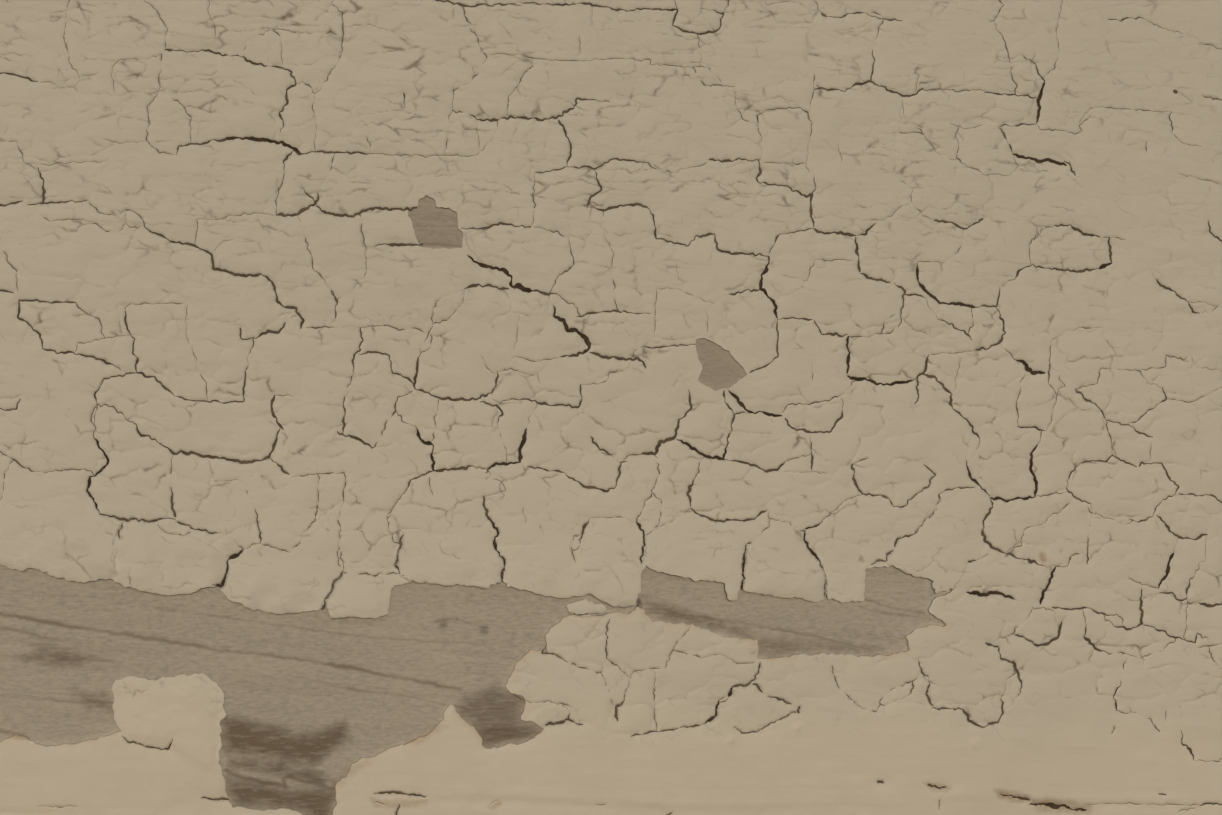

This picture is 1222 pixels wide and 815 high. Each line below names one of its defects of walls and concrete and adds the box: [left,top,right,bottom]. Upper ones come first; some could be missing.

peeling [408,195,463,249]
crack [0,0,485,539]
crack [216,0,1222,737]
peeling [696,338,746,390]
peeling [0,501,964,815]
crack [123,737,173,750]
crack [1181,731,1221,762]